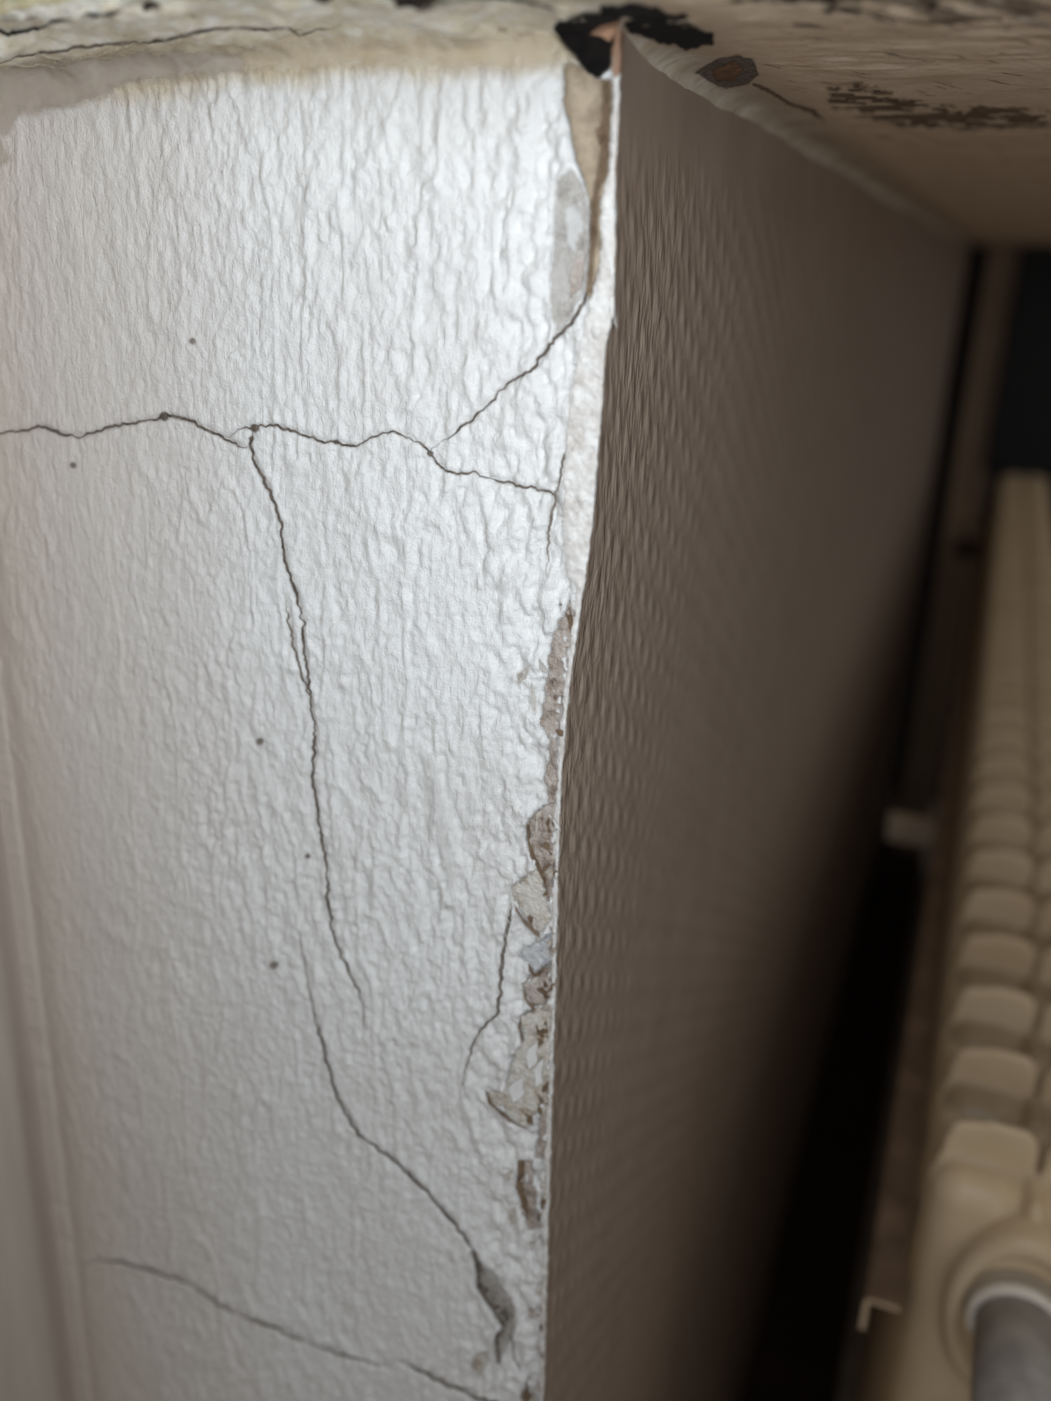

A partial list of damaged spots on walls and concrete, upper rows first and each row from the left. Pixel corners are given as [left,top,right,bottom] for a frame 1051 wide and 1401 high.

peeling [591,20,621,41]
crack [0,268,599,1030]
crack [304,962,482,1266]
crack [462,909,512,1085]
flaking render [472,594,576,1401]
crack [97,1260,489,1401]